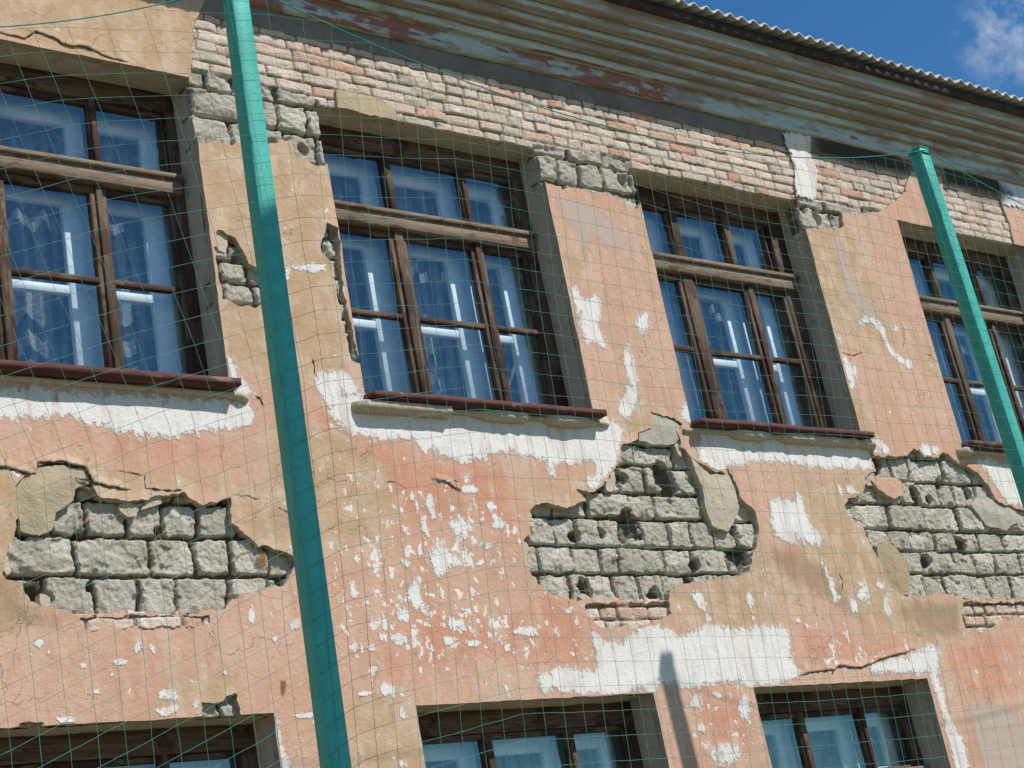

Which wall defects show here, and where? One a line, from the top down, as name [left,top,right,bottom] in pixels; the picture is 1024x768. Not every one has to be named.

crack [0,25,128,62]
spalling [178,13,241,158]
spalling [252,26,909,241]
spalling [203,231,261,313]
spalling [285,226,358,362]
peeling [570,285,609,350]
peeling [0,355,257,442]
crack [0,453,182,492]
spalling [314,309,1024,733]
spalling [2,486,293,676]
peeling [156,688,180,717]
crack [797,643,915,676]